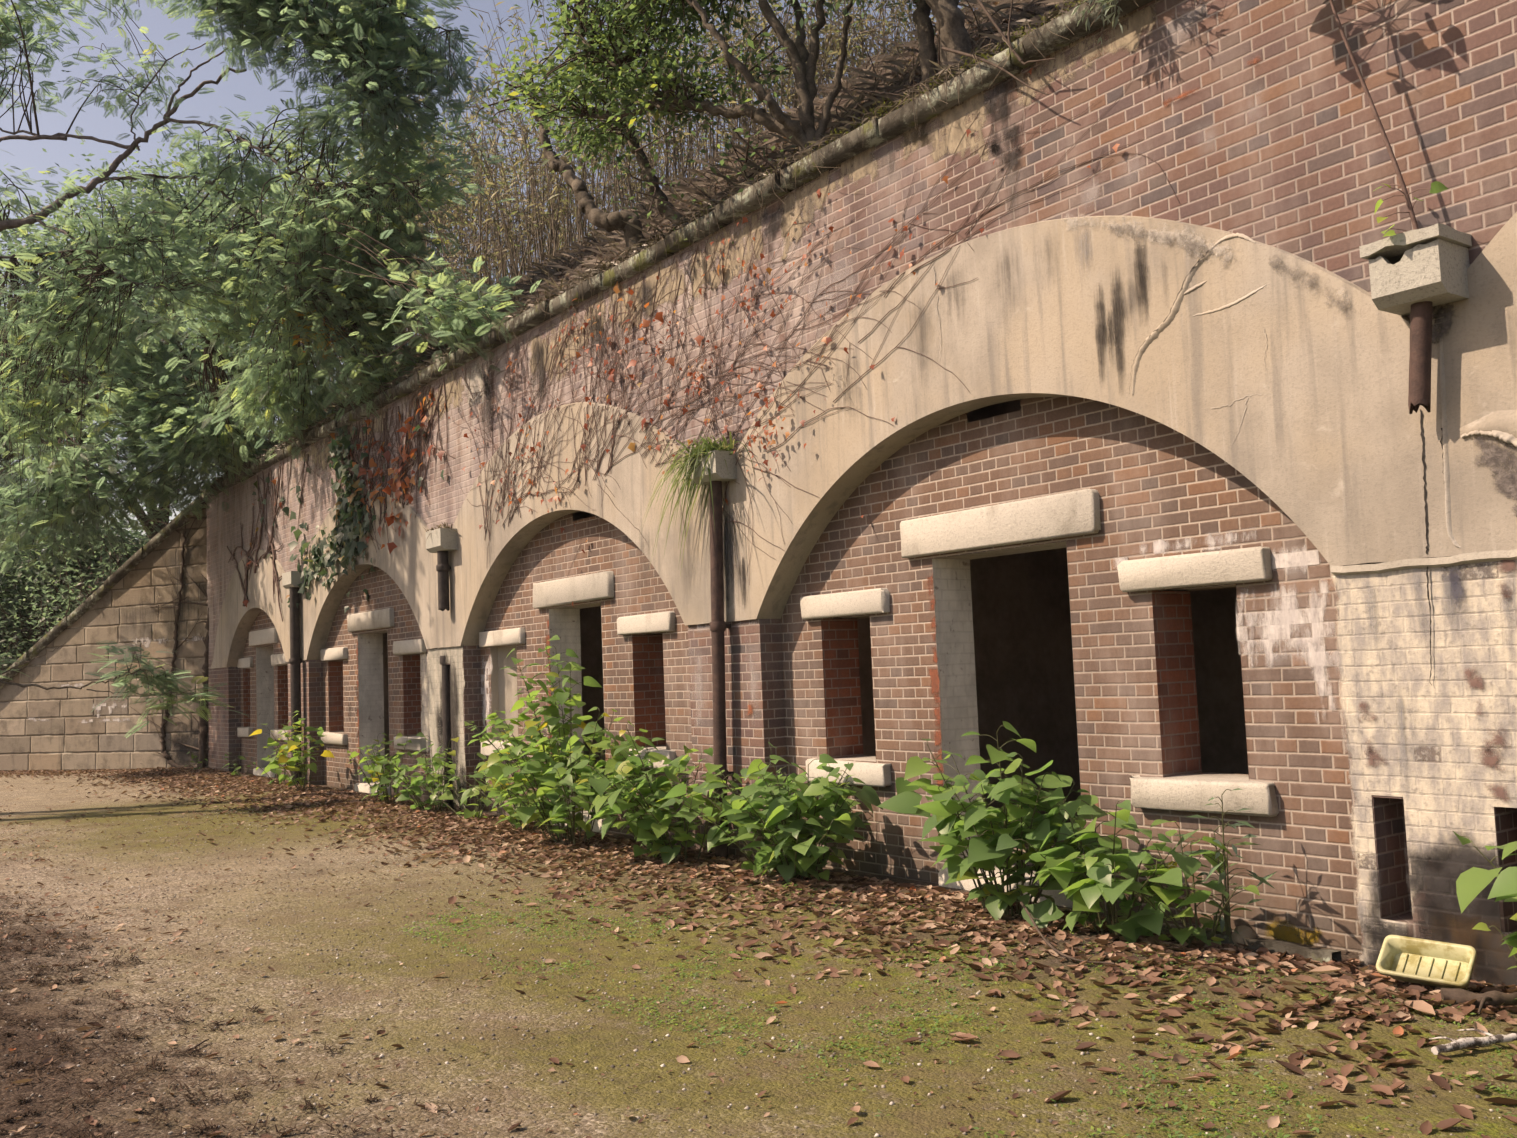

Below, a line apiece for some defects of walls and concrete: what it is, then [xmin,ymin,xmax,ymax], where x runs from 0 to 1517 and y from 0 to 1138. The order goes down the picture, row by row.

water stain [985,77,1020,170]
water stain [1095,244,1148,376]
water stain [1116,540,1190,569]
water stain [1208,532,1237,550]
water stain [1236,547,1339,710]
crack [1420,318,1461,685]
water stain [1445,571,1464,613]
flaking render [1474,438,1517,517]
water stain [1362,833,1517,986]